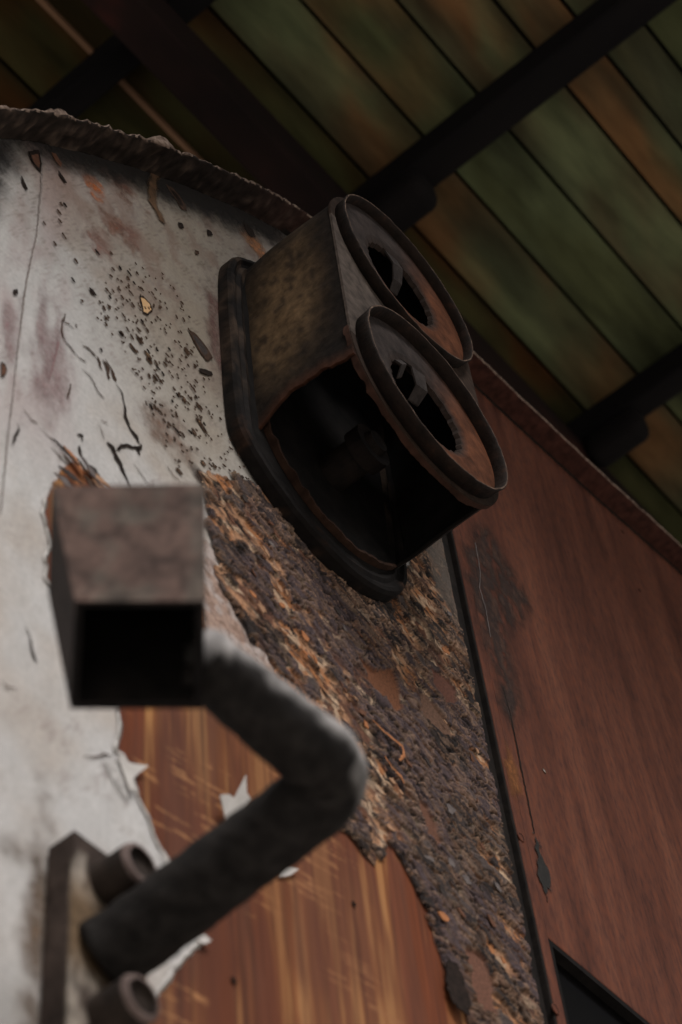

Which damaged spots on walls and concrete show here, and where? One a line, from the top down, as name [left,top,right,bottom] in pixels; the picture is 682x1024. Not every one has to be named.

crack [1,154,180,513]
peeling [80,249,249,480]
peeling [40,439,109,586]
peeling [204,541,274,671]
peeling [113,708,281,863]
peeling [152,831,469,1024]
rust [372,719,406,784]
peeling [533,832,552,894]